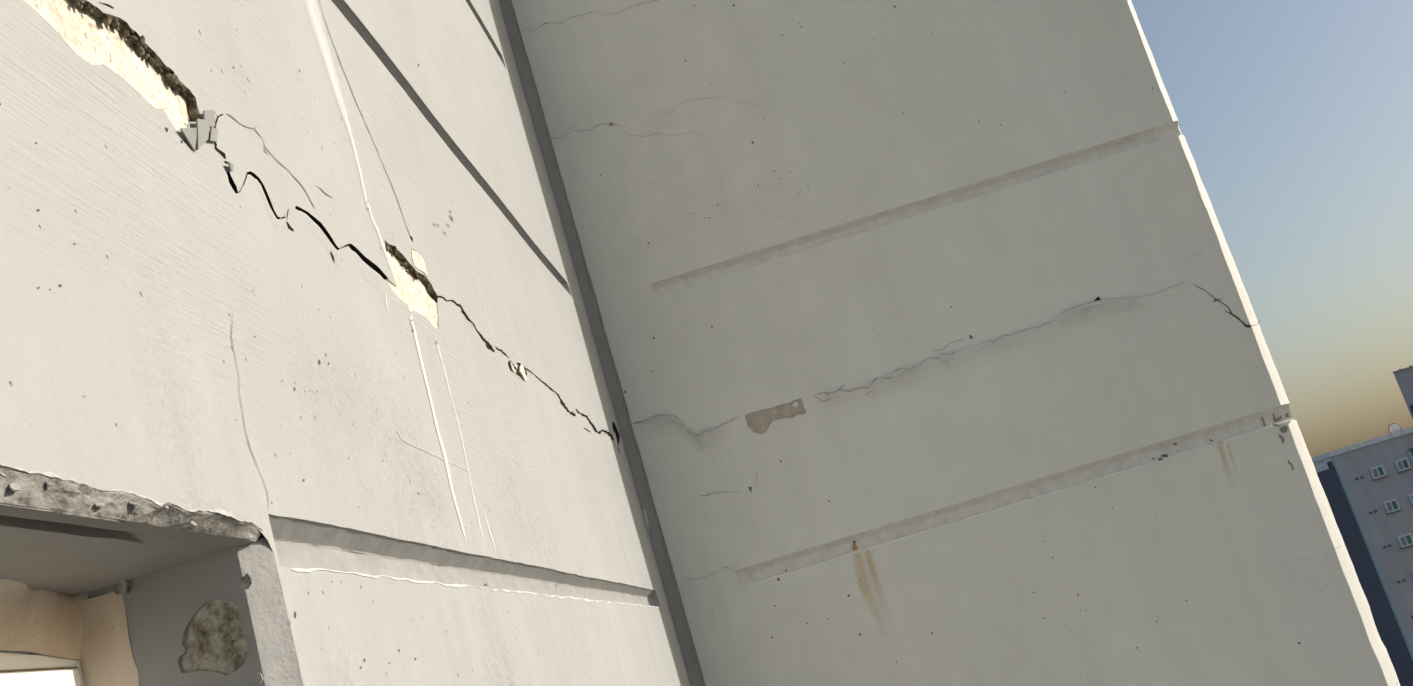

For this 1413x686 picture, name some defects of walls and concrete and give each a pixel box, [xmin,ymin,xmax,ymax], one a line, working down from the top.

crack [214,113,388,280]
crack [319,0,417,252]
peeling [0,464,263,542]
crack [231,312,449,566]
spalling [385,240,439,329]
crack [438,296,740,452]
spalling [745,399,806,434]
crack [814,239,1257,402]
spalling [178,573,252,675]